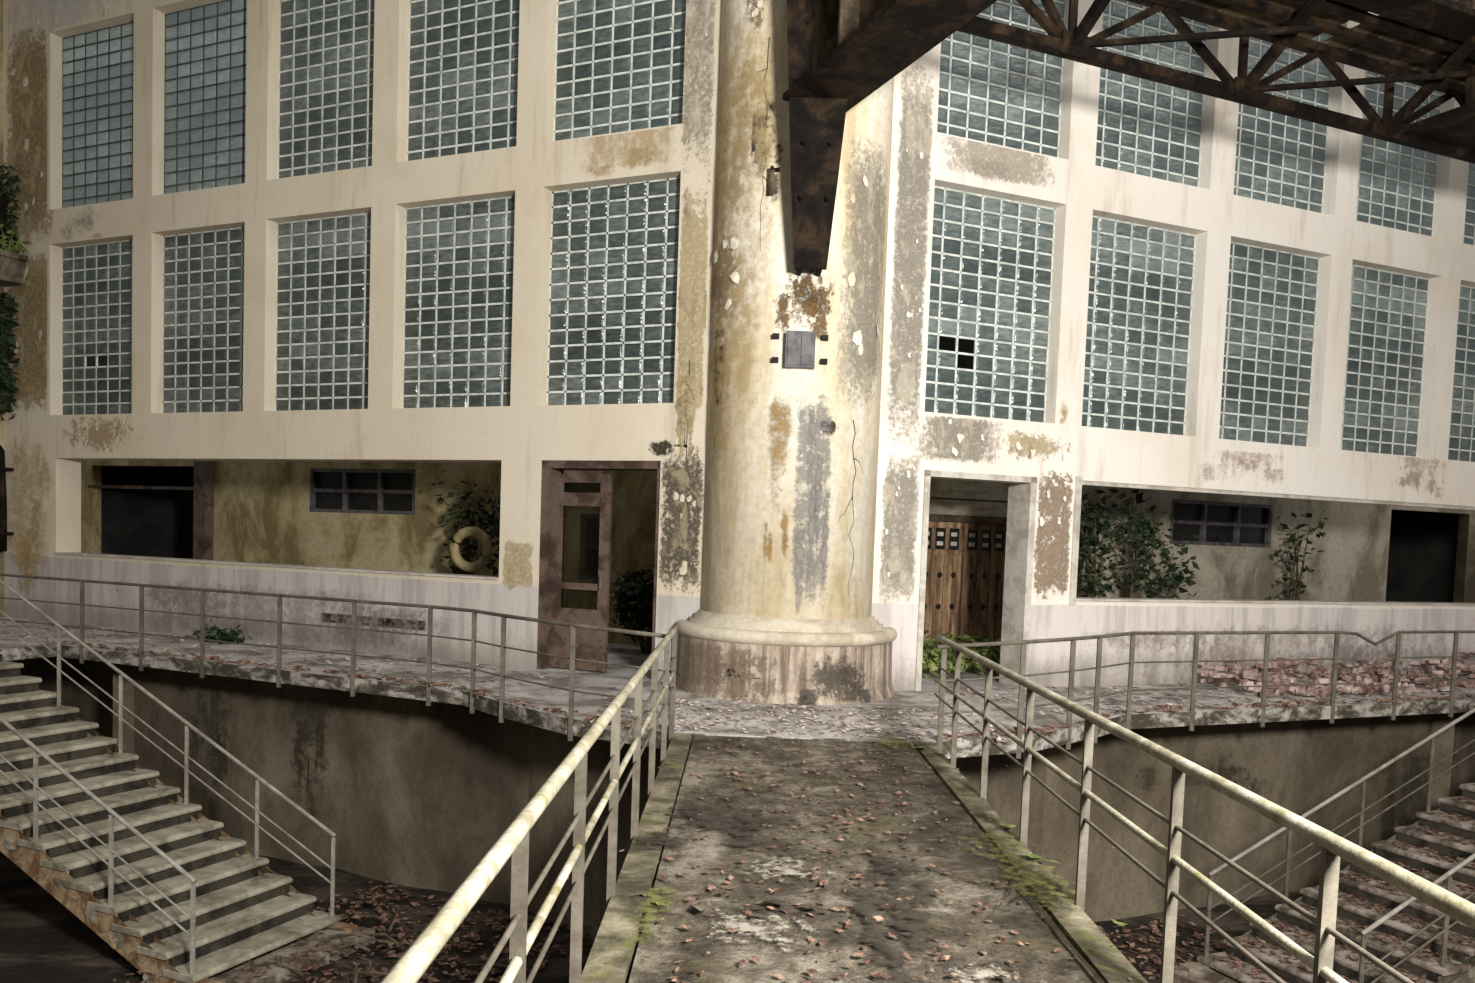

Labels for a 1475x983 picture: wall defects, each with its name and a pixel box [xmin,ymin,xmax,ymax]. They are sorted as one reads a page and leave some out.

peeling [648,0,741,593]
leakage [710,43,782,448]
leakage [676,641,871,705]
leakage [764,395,831,610]
peeling [838,65,1073,602]